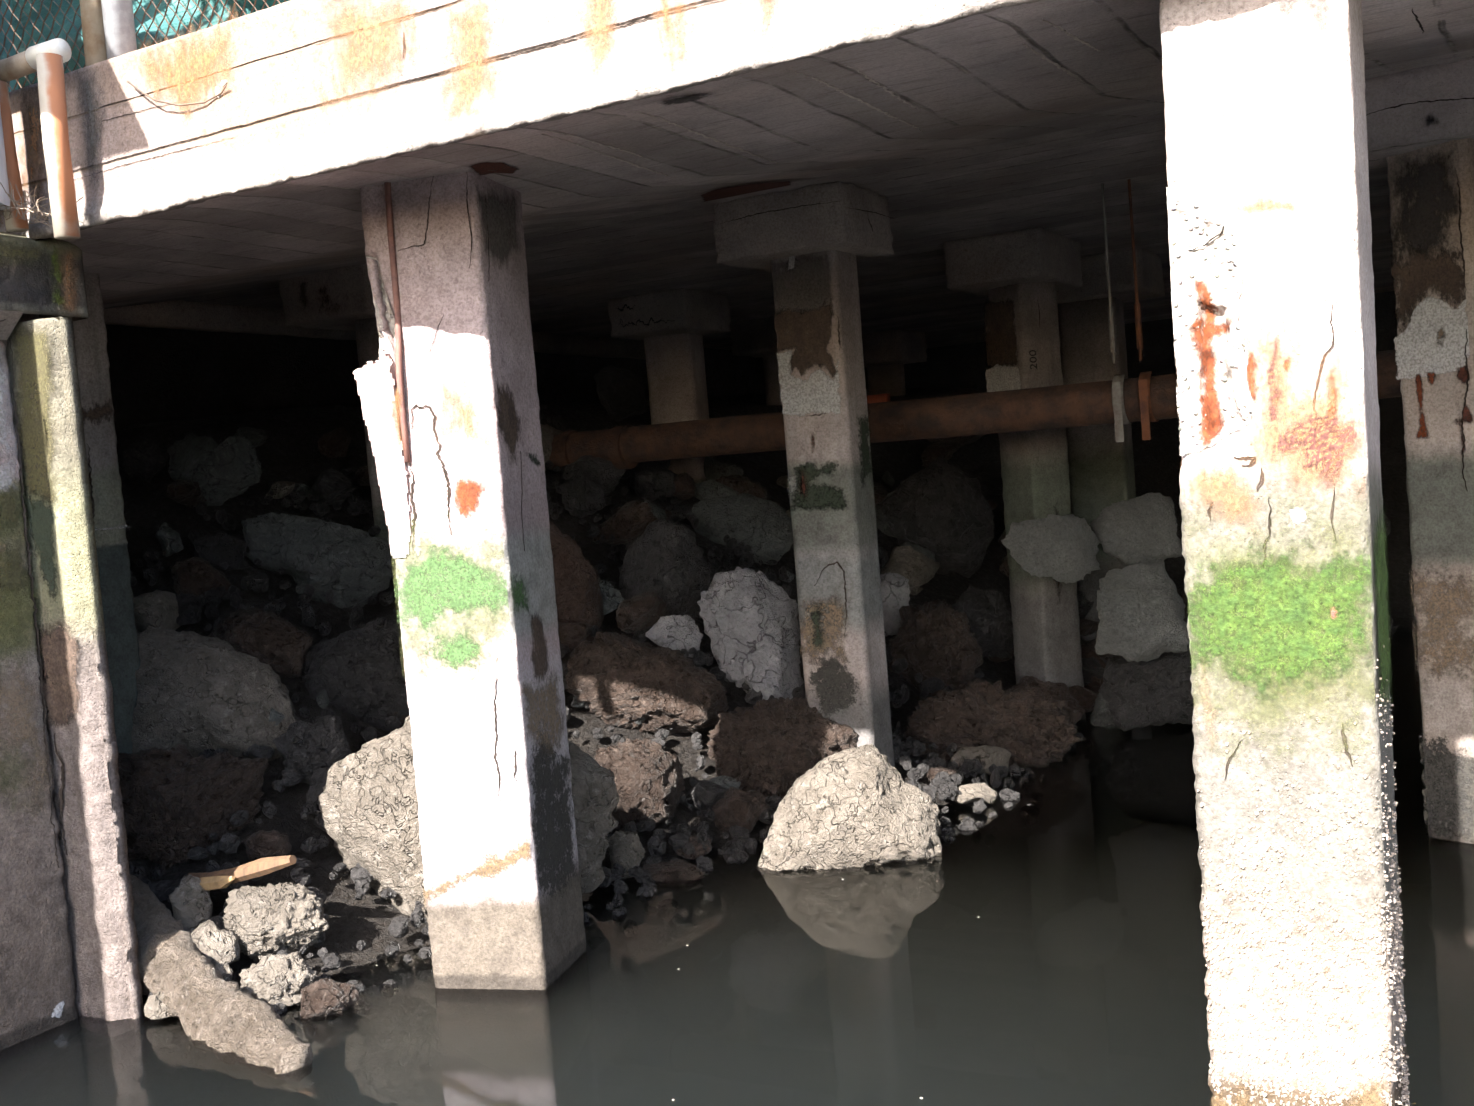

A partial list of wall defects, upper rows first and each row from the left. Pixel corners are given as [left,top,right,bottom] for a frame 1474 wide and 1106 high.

spalling [365,182,411,462]
crack [409,404,453,553]
rust [454,479,486,517]
leakage [772,255,836,377]
spalling [1166,187,1252,455]
rust [1190,280,1231,447]
rust [1246,335,1365,486]
crack [1313,301,1338,545]
leakage [1390,153,1466,331]
peeling [1394,296,1470,380]
leakage [423,615,577,903]
leakage [1419,734,1474,842]